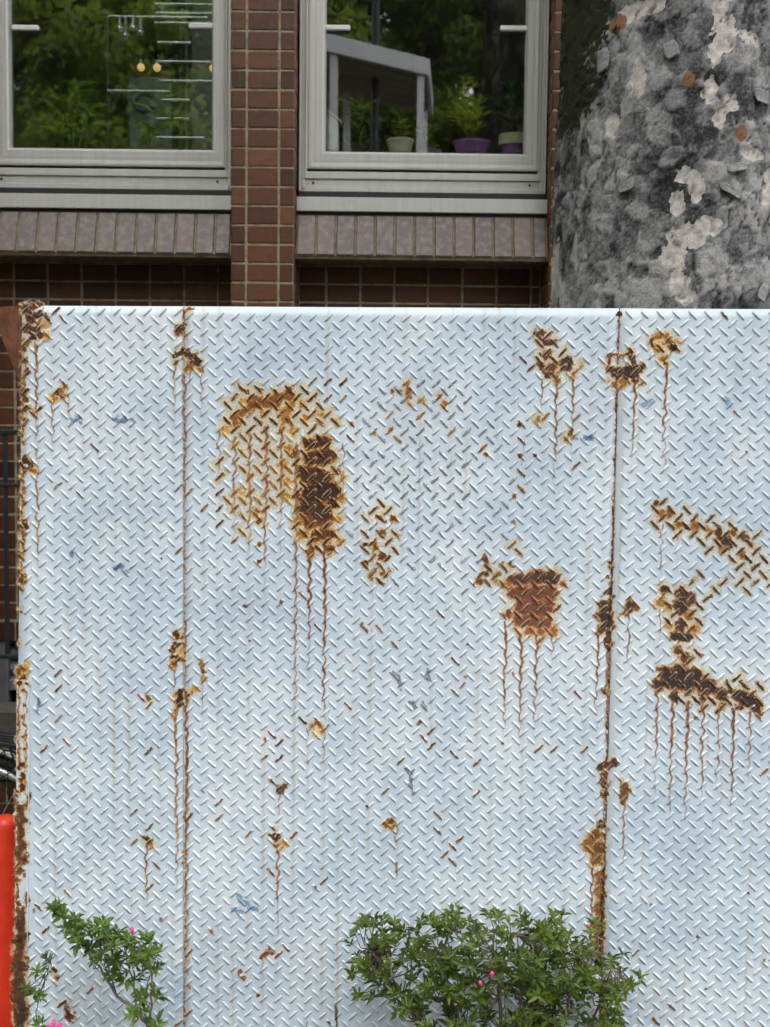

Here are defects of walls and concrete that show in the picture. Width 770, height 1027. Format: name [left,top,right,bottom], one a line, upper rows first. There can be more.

corrosion [17,301,69,594]
corrosion [512,328,586,499]
corrosion [14,660,31,688]
corrosion [168,306,207,1027]
corrosion [200,377,355,749]
corrosion [360,498,402,586]
corrosion [473,540,568,731]
corrosion [574,311,770,981]
corrosion [269,779,288,814]
corrosion [267,826,298,912]
corrosion [382,818,399,844]
corrosion [259,944,290,968]